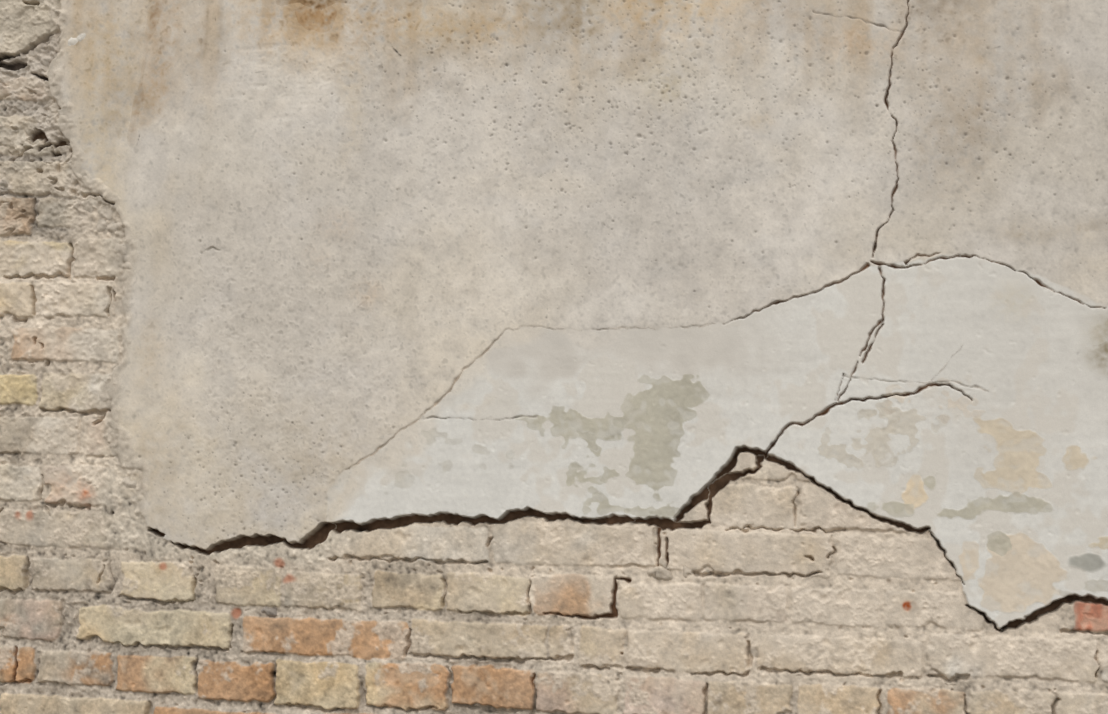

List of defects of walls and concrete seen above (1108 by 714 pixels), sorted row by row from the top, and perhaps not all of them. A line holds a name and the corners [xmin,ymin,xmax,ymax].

flaking render [35,0,151,519]
crack [147,0,1108,632]
peeling [514,373,711,519]
peeling [817,377,1054,520]
peeling [1061,444,1098,471]
peeling [958,529,1108,614]